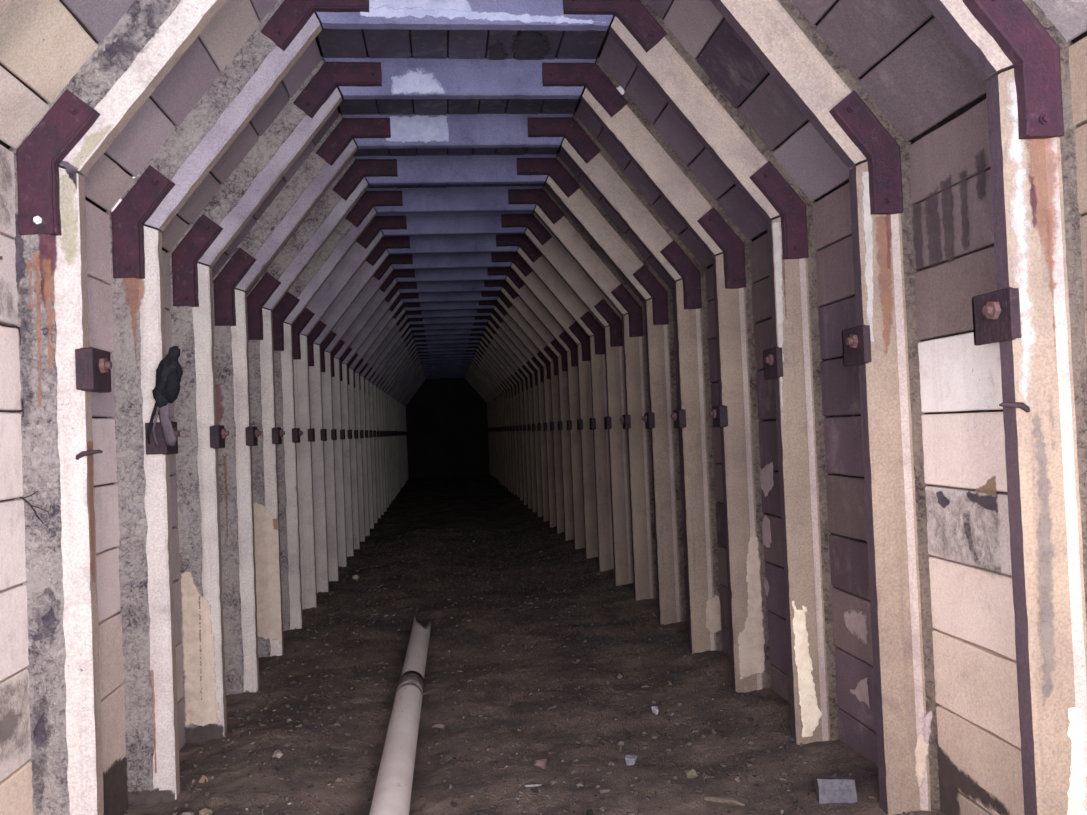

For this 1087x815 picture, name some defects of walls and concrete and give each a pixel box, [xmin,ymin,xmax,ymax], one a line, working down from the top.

leakage [912,149,986,269]
corrosion [1027,138,1057,291]
corrosion [27,234,57,403]
corrosion [123,278,144,358]
corrosion [876,216,892,354]
leakage [929,476,1001,574]
leakage [0,686,27,746]
peeling [705,593,721,634]
peeling [738,515,772,679]
peeling [792,601,822,737]
leakage [937,745,1010,815]
peeling [1067,707,1087,815]